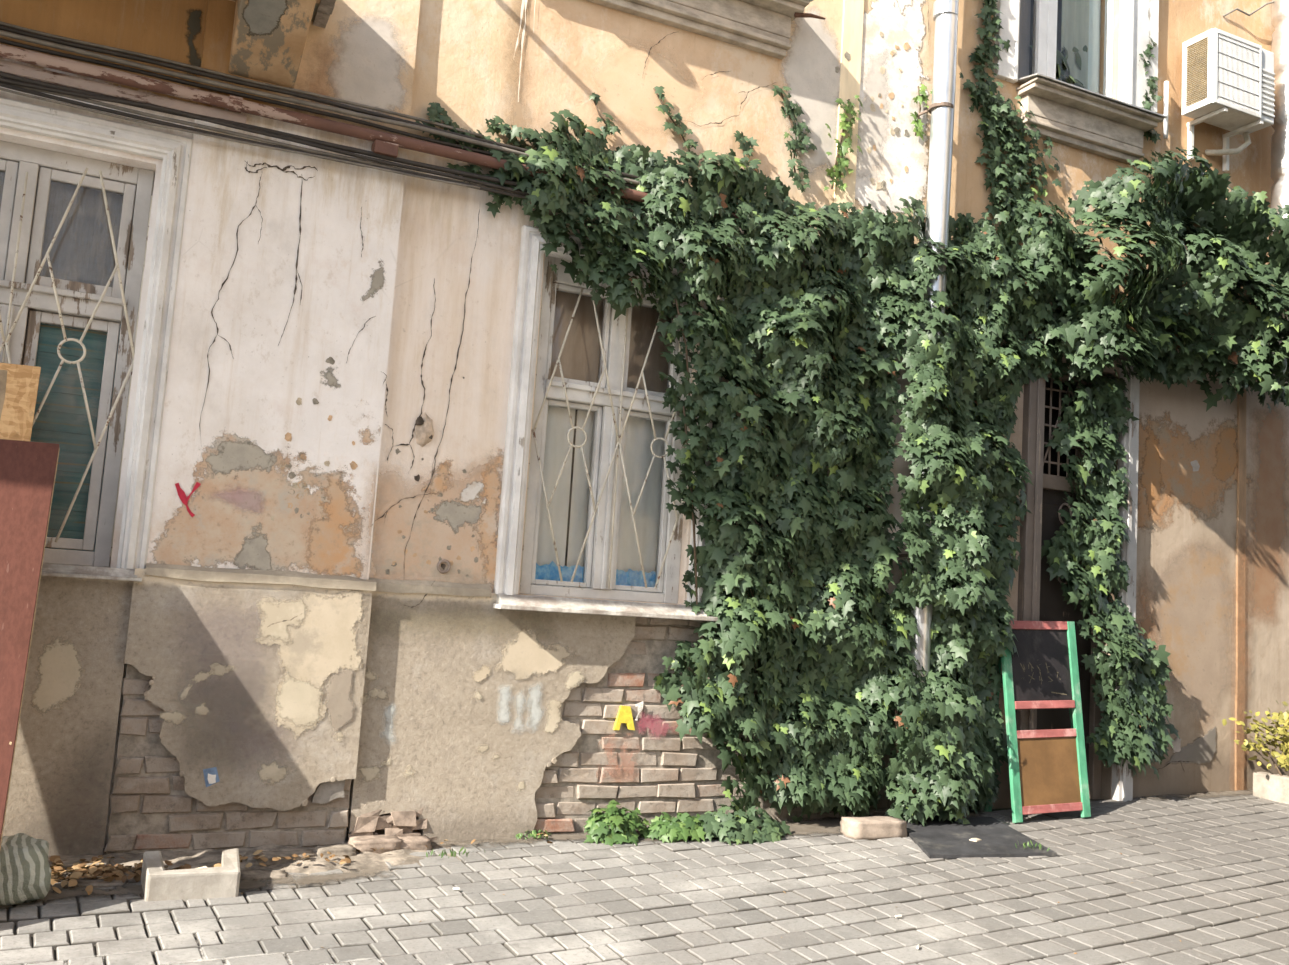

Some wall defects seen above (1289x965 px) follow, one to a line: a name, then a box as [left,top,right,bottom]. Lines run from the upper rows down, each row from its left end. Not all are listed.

flaking render [242,0,288,36]
flaking render [782,0,930,215]
crack [199,161,318,437]
flaking render [352,415,381,445]
crack [368,209,480,560]
flaking render [1137,412,1251,529]
flaking render [152,432,504,742]
flaking render [119,662,236,736]
flaking render [104,756,437,852]
flaking render [472,617,904,837]